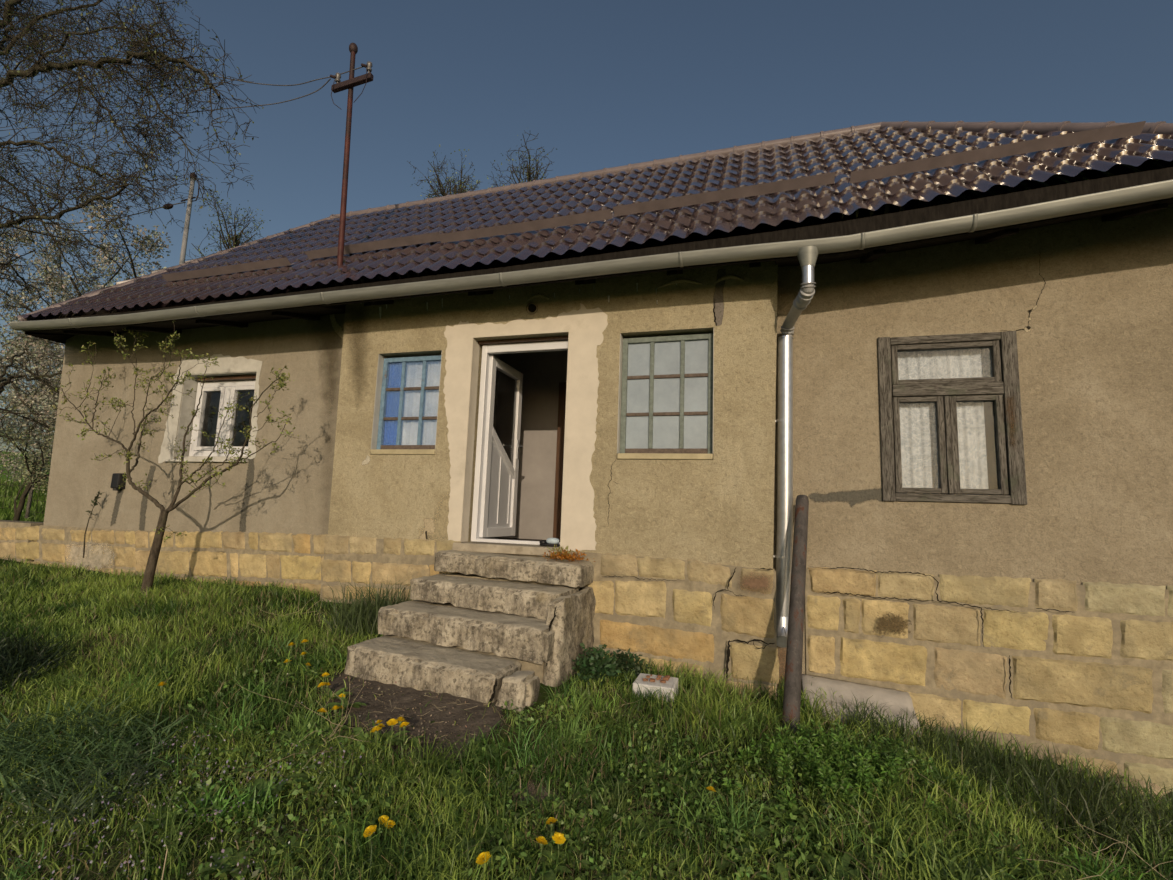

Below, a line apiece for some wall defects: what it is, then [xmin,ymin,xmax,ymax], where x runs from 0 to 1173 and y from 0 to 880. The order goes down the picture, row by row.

crack [1004,247,1046,331]
crack [713,568,773,606]
crack [726,639,775,678]